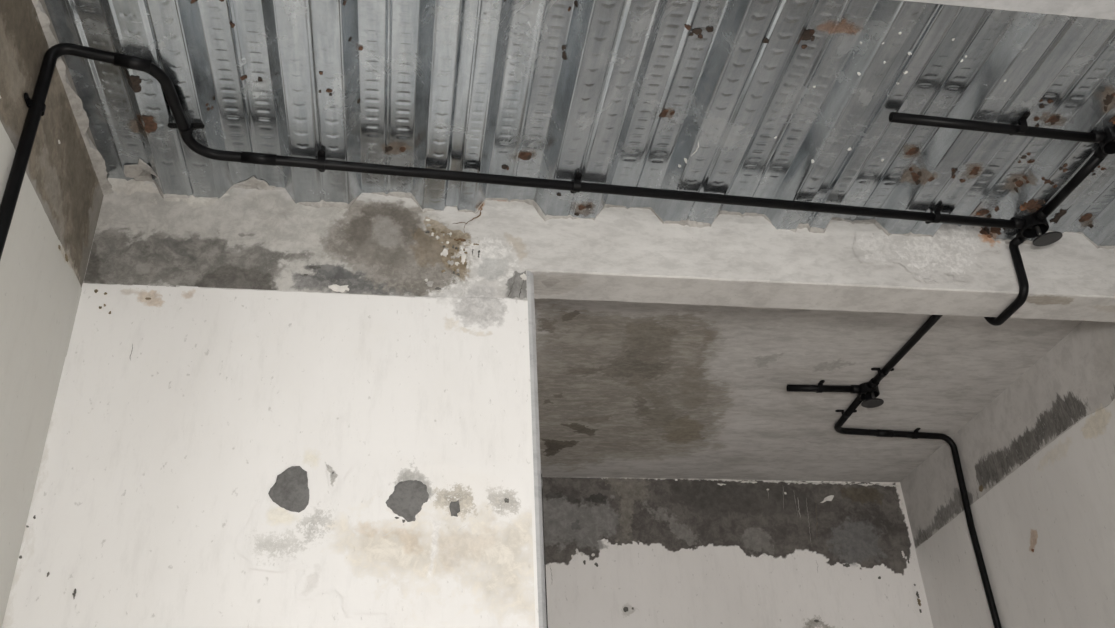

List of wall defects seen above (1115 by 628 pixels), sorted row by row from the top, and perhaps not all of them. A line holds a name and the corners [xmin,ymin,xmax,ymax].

rust [684,25,714,39]
water stain [0,0,49,148]
water stain [26,66,497,341]
flaking render [418,213,480,290]
rust [900,145,937,185]
rust [974,206,1006,254]
rust [1004,153,1068,213]
rust [1079,214,1093,228]
water stain [473,252,1115,628]
water stain [2,357,71,628]
water stain [235,448,536,628]
peeling [796,610,842,628]